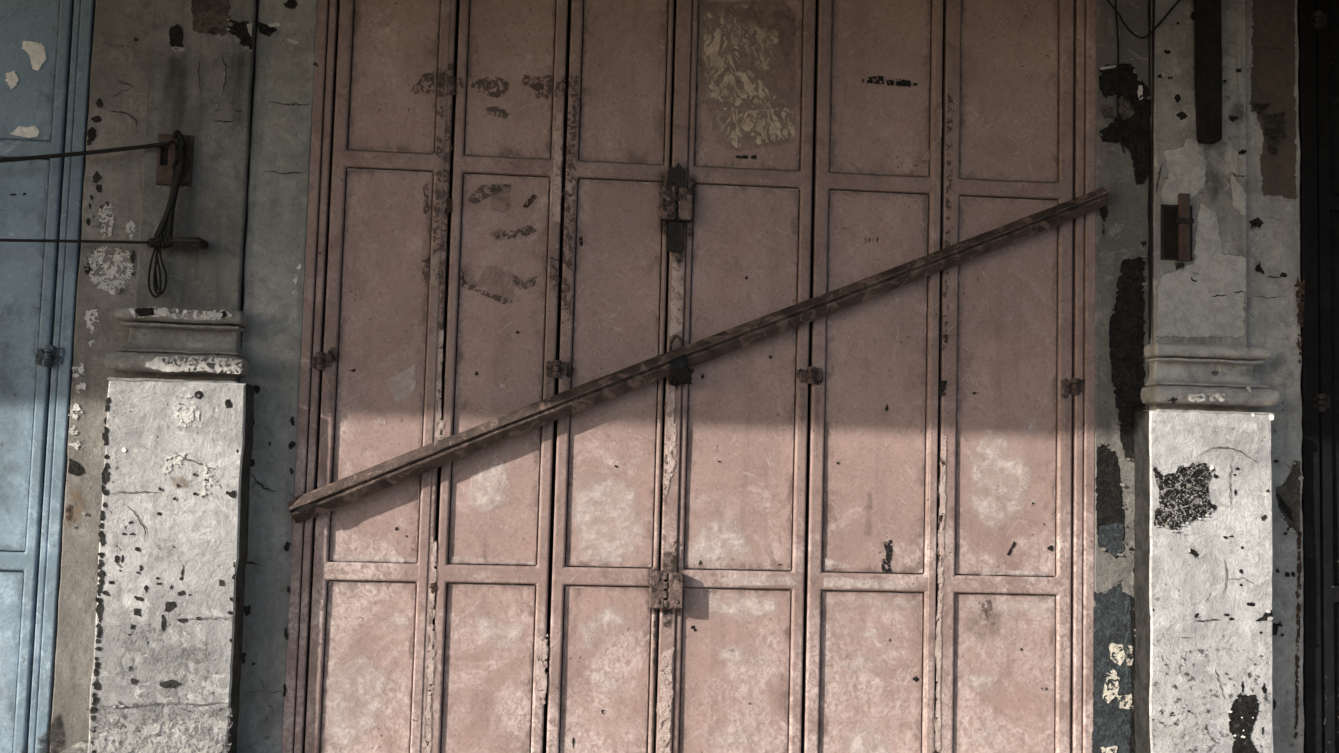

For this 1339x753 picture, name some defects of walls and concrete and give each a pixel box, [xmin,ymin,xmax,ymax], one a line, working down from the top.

flaking render [168,0,299,52]
peeling [1222,0,1298,199]
peeling [83,171,136,295]
peeling [68,363,86,450]
peeling [115,353,243,374]
peeling [128,307,233,320]
peeling [1094,63,1287,558]
flaking render [1273,460,1304,535]
peeling [87,397,236,753]
peeling [1092,568,1136,753]
flaking render [1151,641,1276,753]
peeling [1247,602,1284,637]